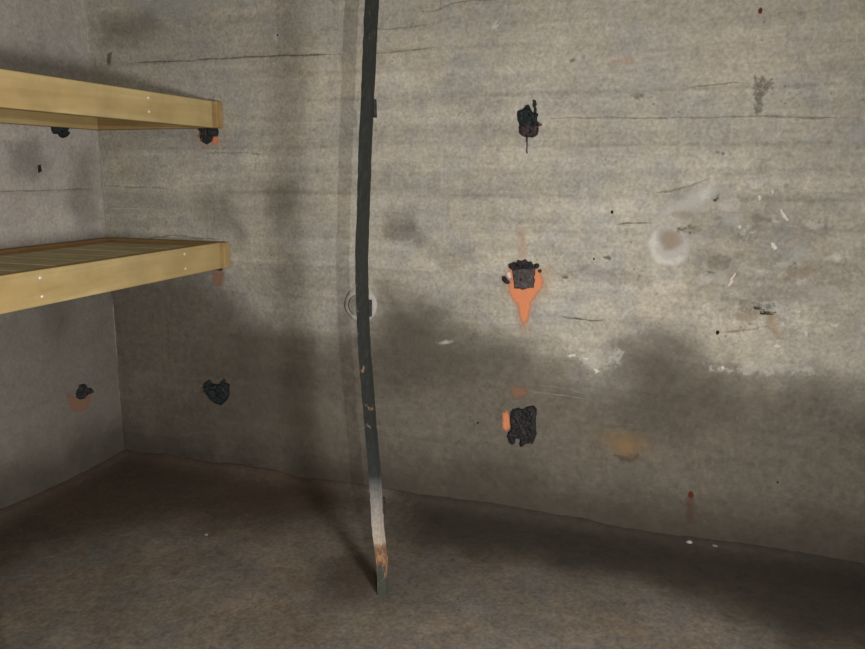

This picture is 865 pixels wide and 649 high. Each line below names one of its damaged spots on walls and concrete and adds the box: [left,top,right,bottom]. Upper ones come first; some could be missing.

peeling [520,125,538,137]
damp [0,278,369,544]
corrosion [509,269,543,325]
damp [371,316,865,643]